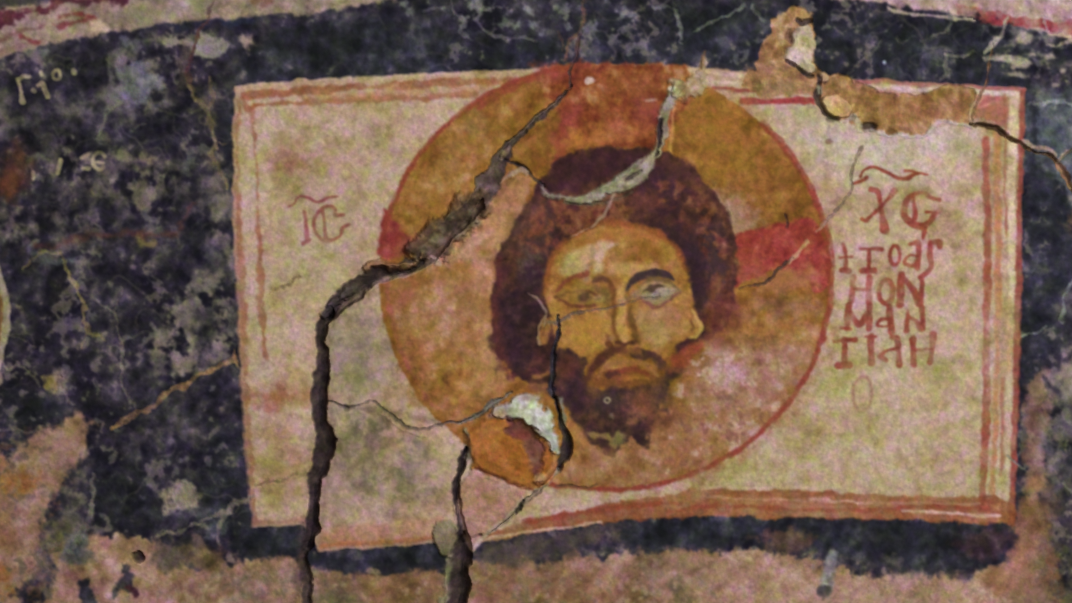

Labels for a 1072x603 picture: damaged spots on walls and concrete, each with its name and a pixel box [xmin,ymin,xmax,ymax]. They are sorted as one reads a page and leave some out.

peeling [583,75,597,86]
flaking render [736,4,977,146]
crack [845,10,1072,193]
crack [154,0,768,603]
crack [1019,278,1072,339]
peeling [465,391,561,493]